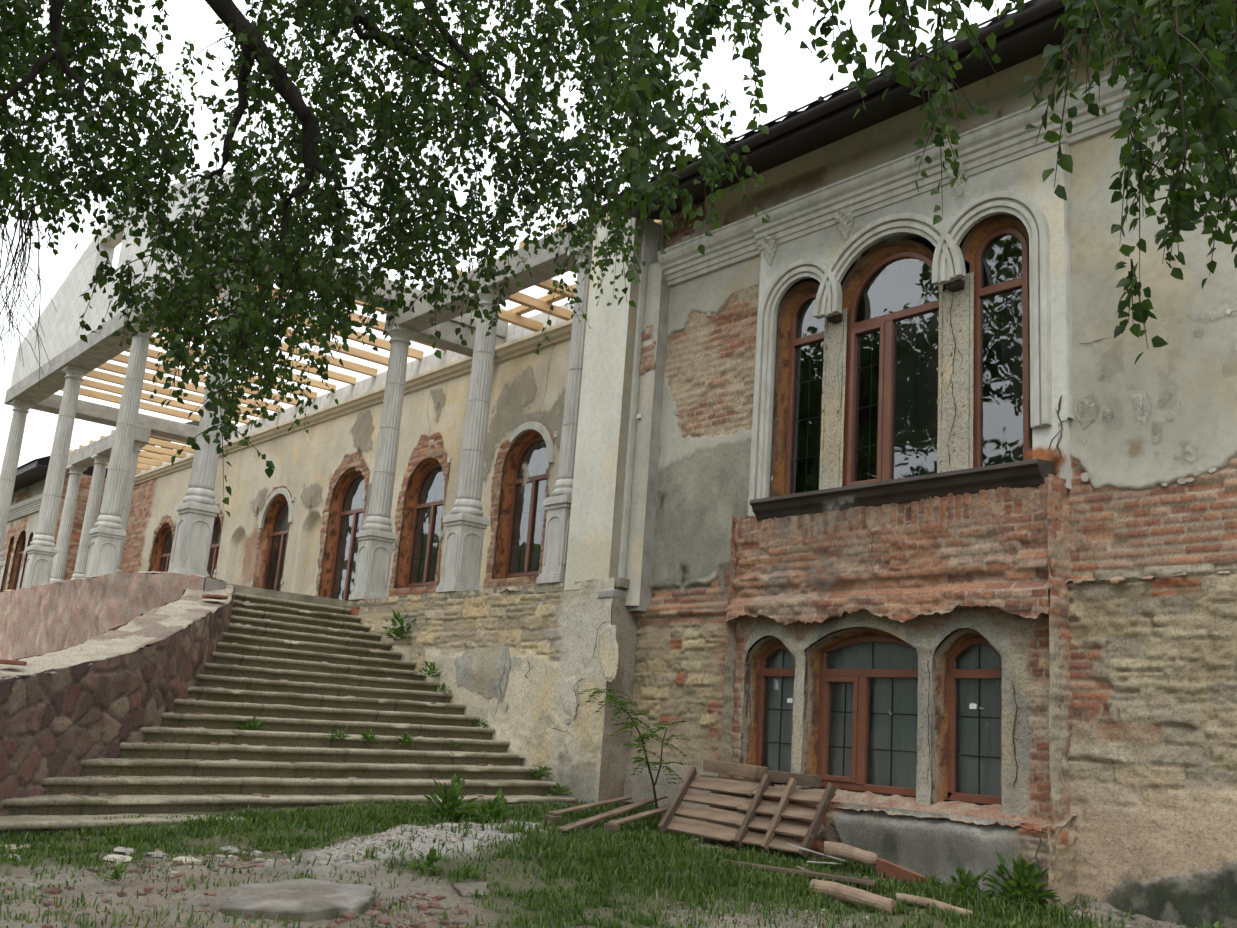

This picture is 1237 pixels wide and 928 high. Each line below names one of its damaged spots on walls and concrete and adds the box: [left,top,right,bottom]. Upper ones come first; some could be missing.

peeling [662,201,707,249]
peeling [639,285,759,439]
spalling [598,624,619,682]
peeling [624,457,1237,901]
crack [1012,682,1022,786]